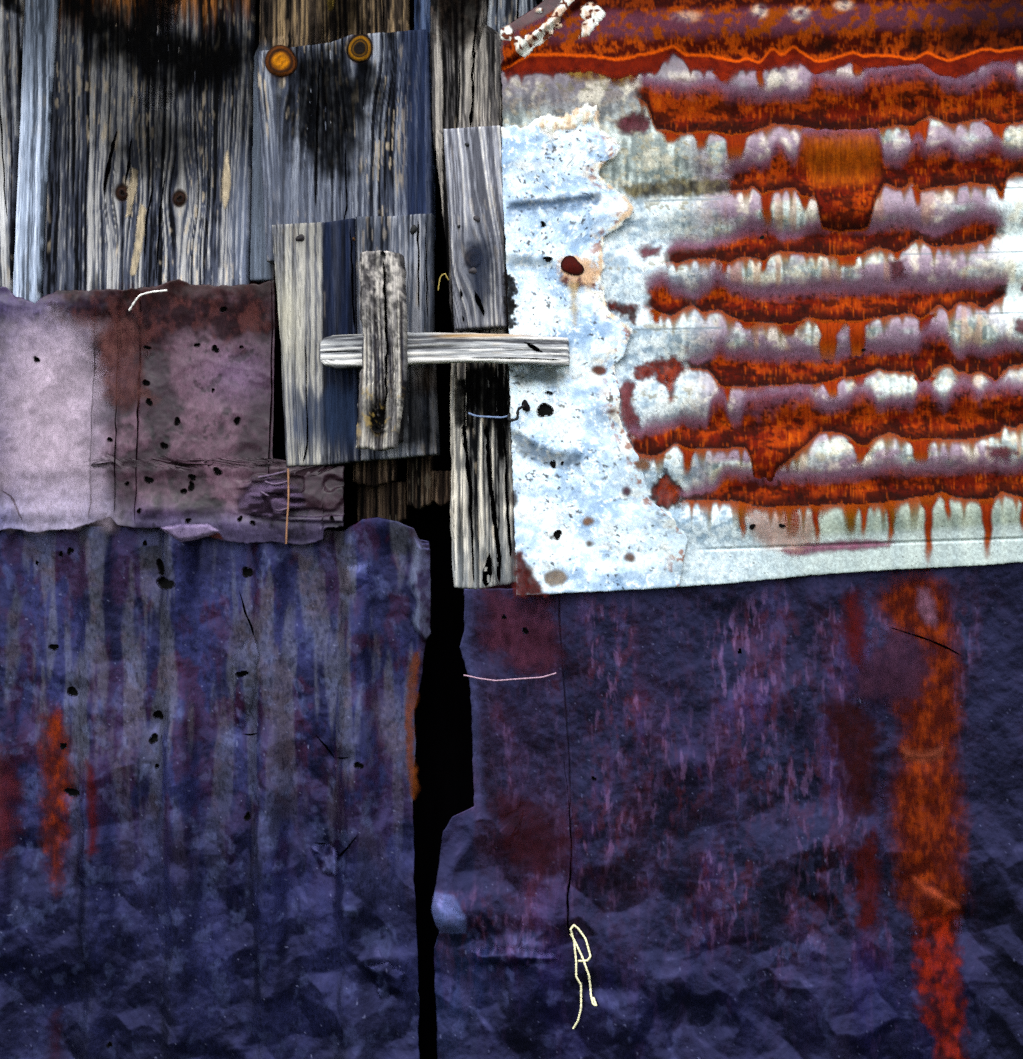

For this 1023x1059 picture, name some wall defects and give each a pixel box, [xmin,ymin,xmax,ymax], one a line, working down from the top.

peeling [500,0,605,58]
corrosion [501,0,1023,556]
corrosion [845,593,866,665]
corrosion [0,757,20,859]
corrosion [42,711,72,882]
corrosion [87,764,96,855]
corrosion [821,702,878,815]
corrosion [881,575,965,1059]
corrosion [856,833,877,927]